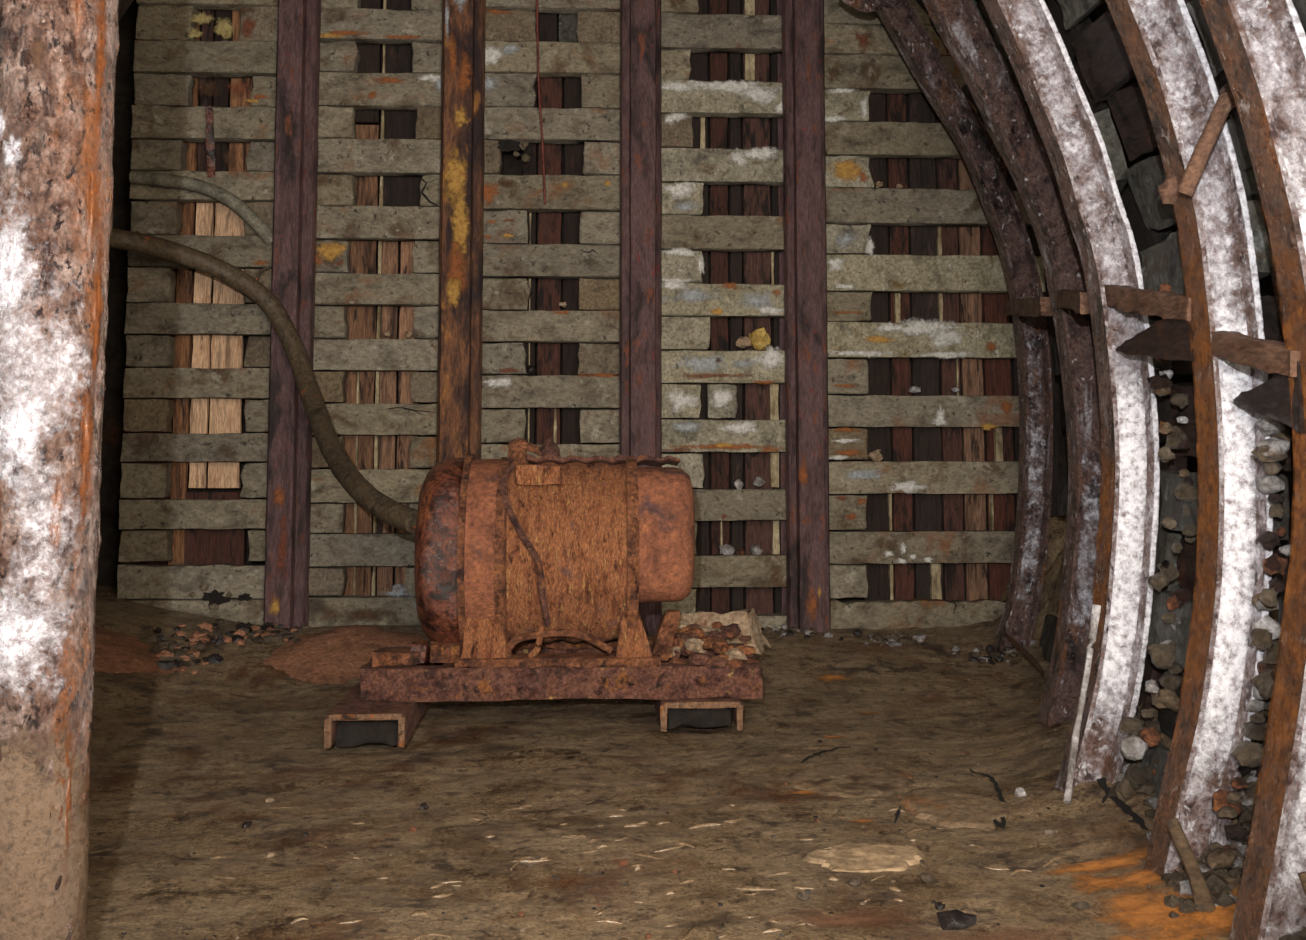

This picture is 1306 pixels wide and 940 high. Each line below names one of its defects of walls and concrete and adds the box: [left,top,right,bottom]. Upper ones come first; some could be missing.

damp [1010,9,1126,283]
damp [1134,0,1202,162]
damp [1196,155,1248,335]
damp [1236,0,1289,100]
rust [1282,293,1306,350]
damp [1284,156,1306,253]
damp [1028,372,1045,506]
damp [1095,310,1147,728]
rust [1182,382,1218,687]
damp [1190,357,1256,794]
rust [1269,370,1306,758]
damp [1283,711,1306,897]